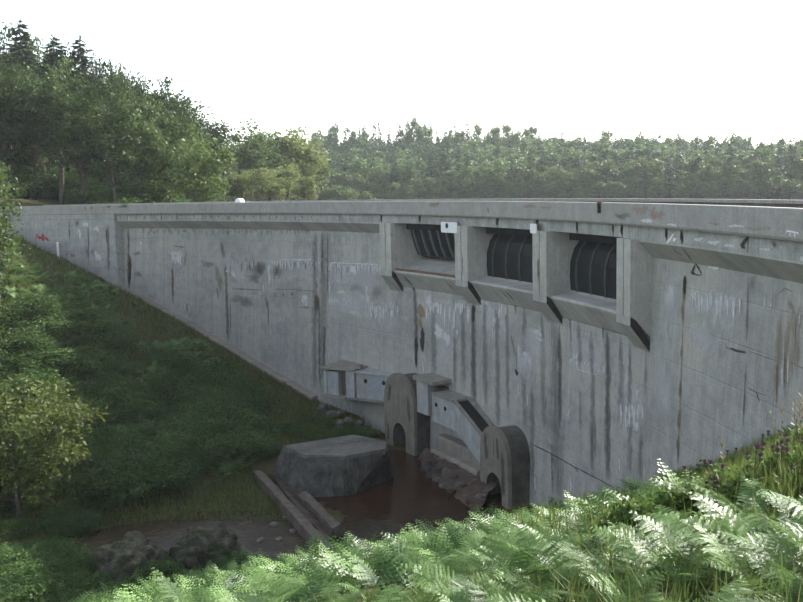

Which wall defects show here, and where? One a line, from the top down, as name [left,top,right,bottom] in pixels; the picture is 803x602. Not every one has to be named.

water stain [225,236,398,328]
water stain [555,324,620,475]
water stain [620,366,643,431]